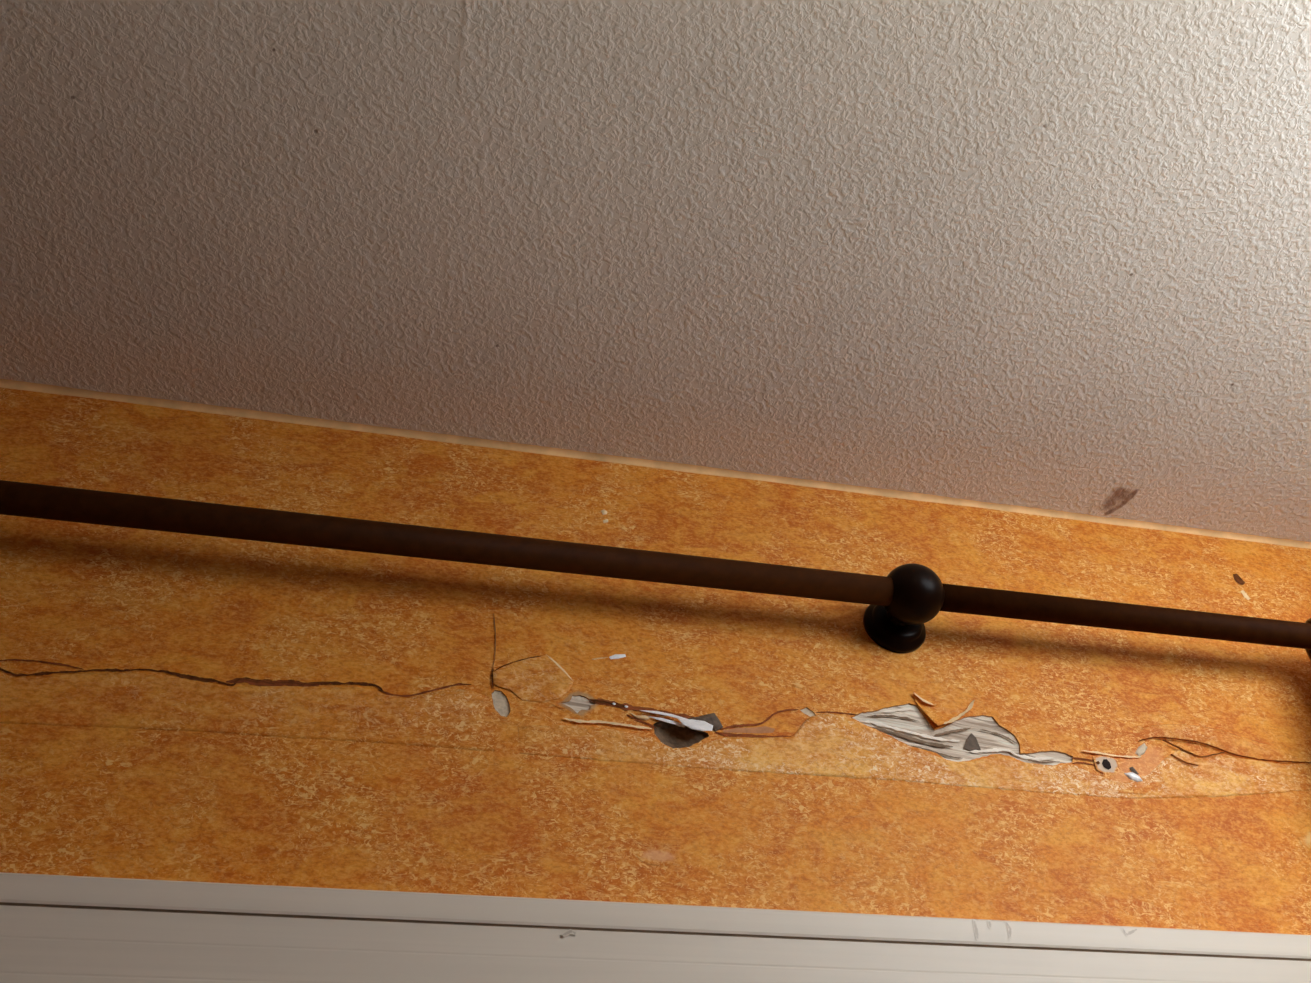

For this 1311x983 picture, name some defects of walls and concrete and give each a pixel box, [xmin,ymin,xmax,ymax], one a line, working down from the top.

crack [0,659,471,697]
spalling [640,710,723,748]
crack [564,698,856,738]
peeling [851,693,1169,794]
crack [1139,737,1311,766]